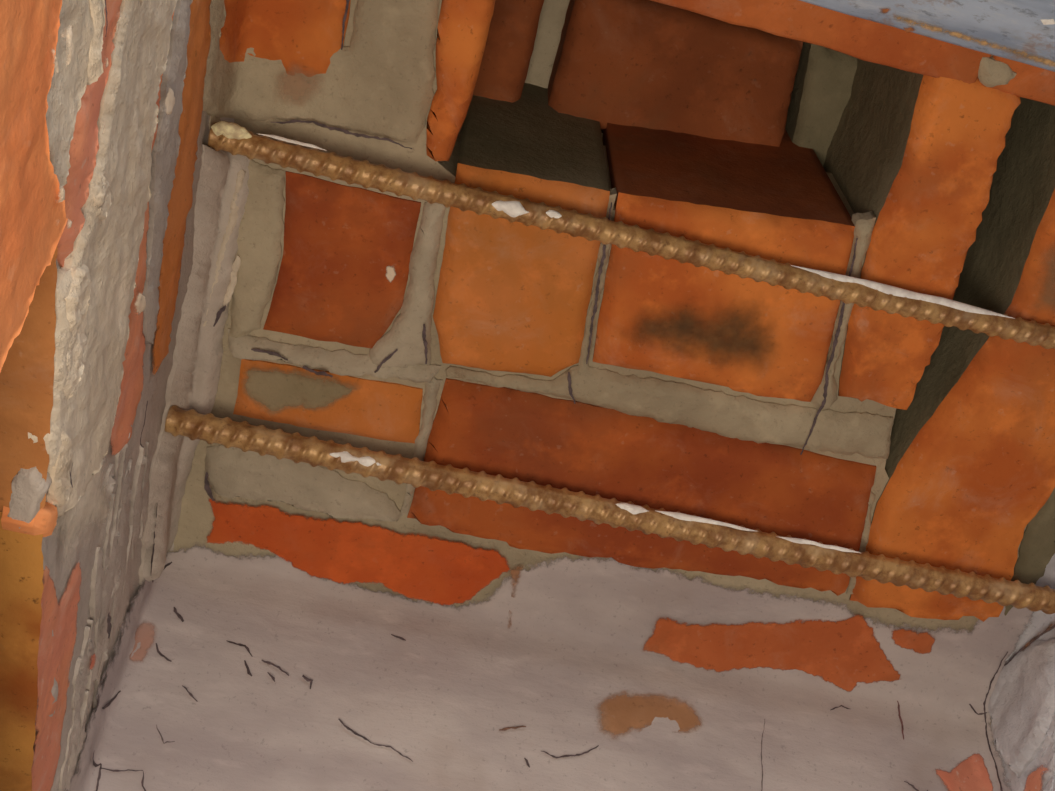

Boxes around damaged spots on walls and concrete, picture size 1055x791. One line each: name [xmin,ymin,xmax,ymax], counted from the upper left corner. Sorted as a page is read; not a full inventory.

peeling [87,0,105,85]
spalling [1,502,58,537]
crack [151,503,172,583]
flaking render [130,623,154,661]
crack [226,640,313,689]
crack [102,691,121,709]
crack [93,750,146,791]
crack [339,719,413,762]
crack [500,724,526,732]
crack [524,745,599,768]
crack [759,723,767,791]
flaking render [1024,766,1048,791]